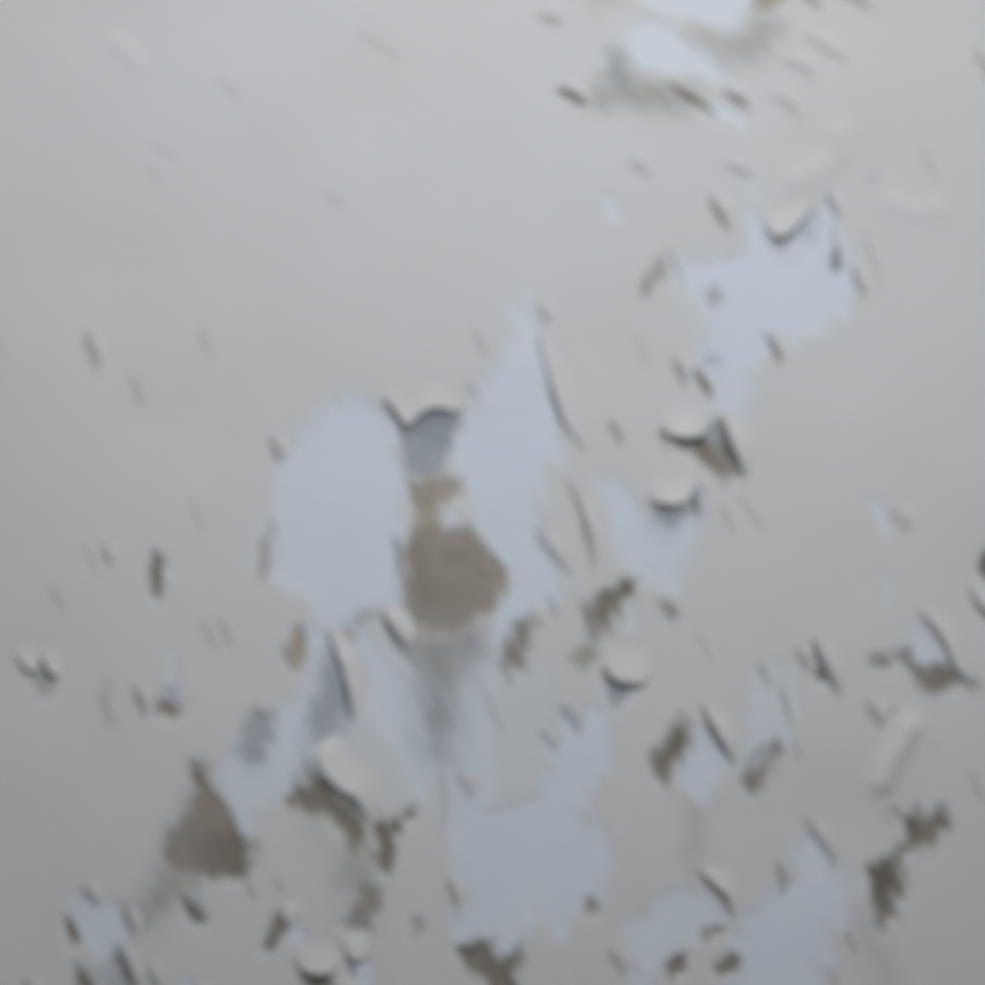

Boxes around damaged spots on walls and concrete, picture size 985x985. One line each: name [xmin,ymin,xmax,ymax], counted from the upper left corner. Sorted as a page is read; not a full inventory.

peeling [554,75,590,107]
peeling [666,81,752,129]
peeling [180,173,962,985]
peeling [966,545,985,621]
peeling [863,608,985,709]
peeling [58,881,170,985]